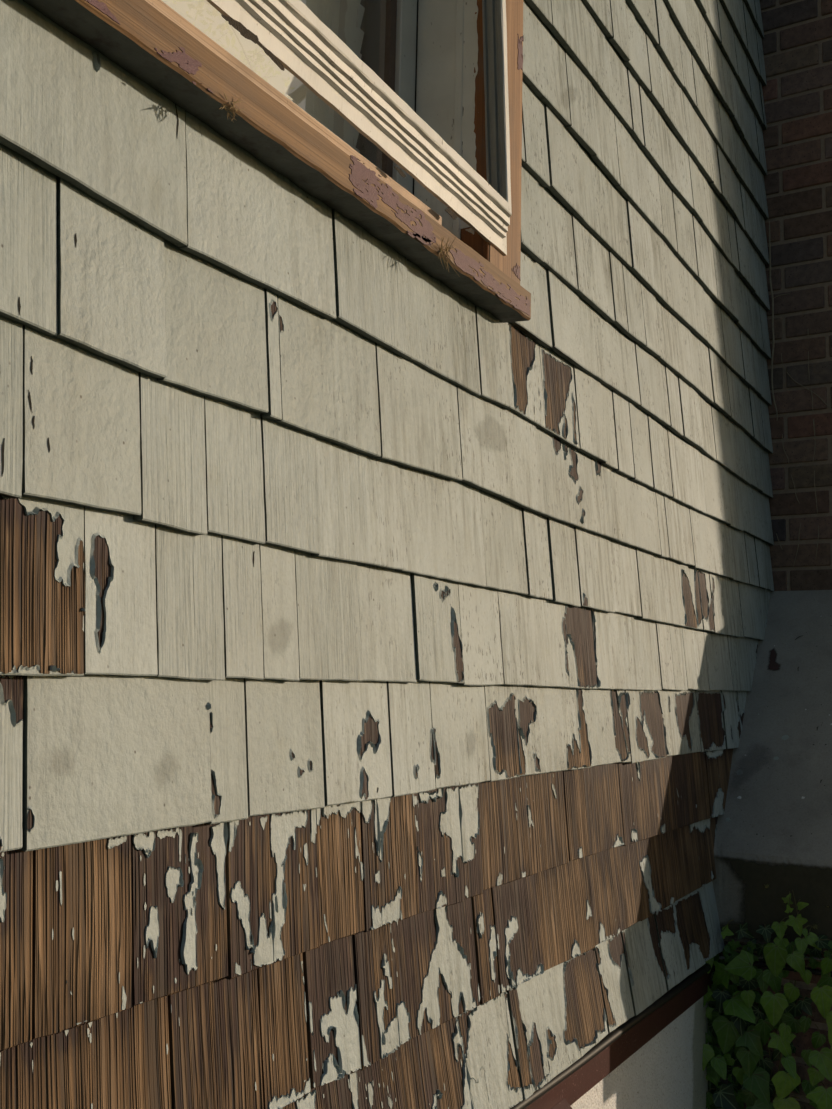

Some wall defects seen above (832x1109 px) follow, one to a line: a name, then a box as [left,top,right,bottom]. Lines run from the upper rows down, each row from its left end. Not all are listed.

peeling [92,52,101,72]
peeling [462,0,478,171]
peeling [349,155,436,246]
peeling [449,247,531,316]
peeling [509,324,585,524]
peeling [0,495,114,727]
peeling [681,569,715,631]
peeling [0,582,745,1109]